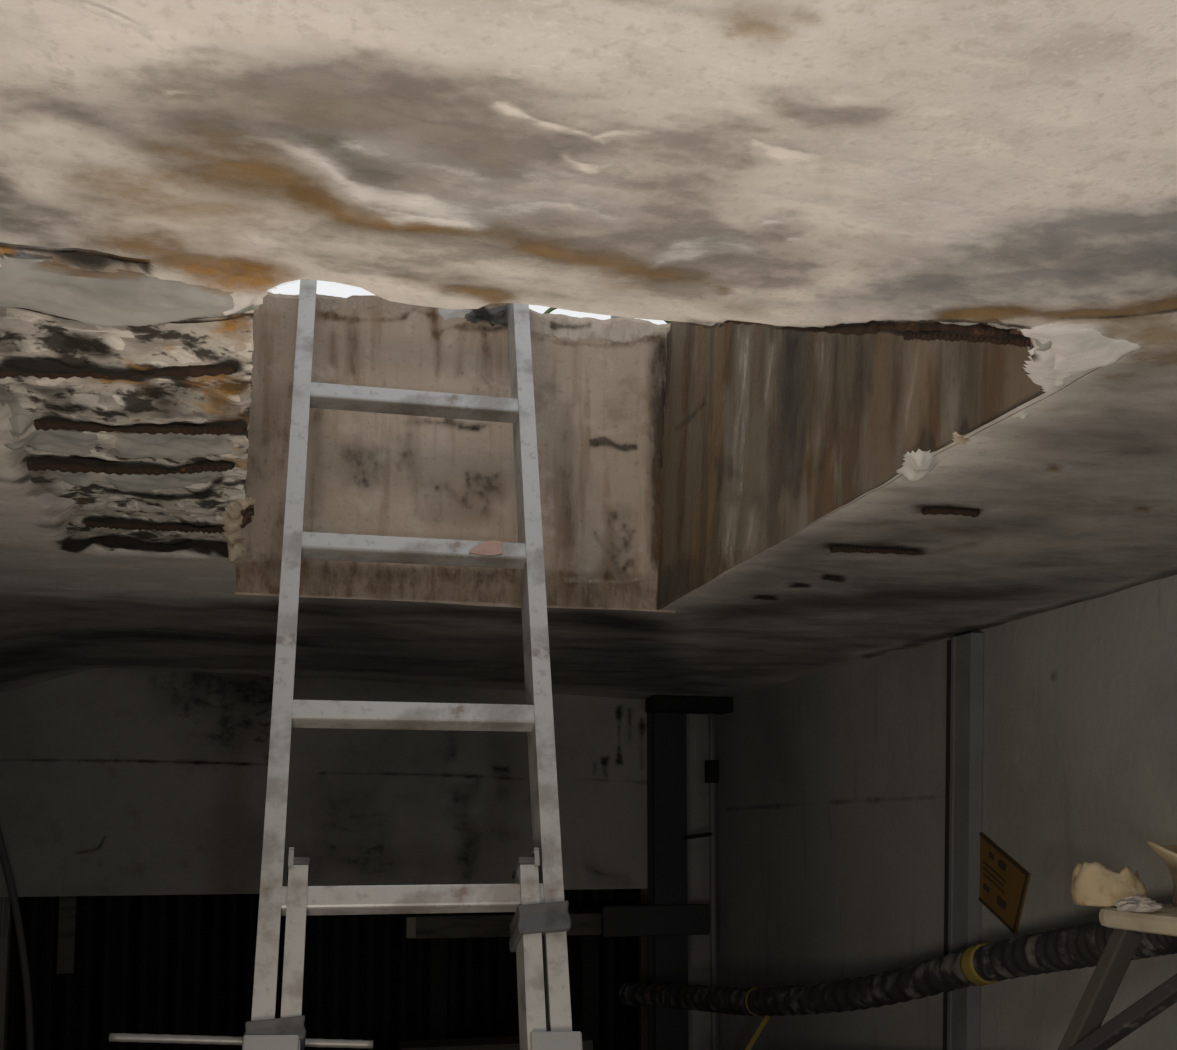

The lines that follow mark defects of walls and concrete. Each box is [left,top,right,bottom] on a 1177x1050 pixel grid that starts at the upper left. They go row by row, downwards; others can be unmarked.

damp [145,65,815,298]
damp [0,207,68,250]
spalling [0,242,151,278]
flaking render [693,319,1148,392]
damp [876,275,976,316]
rust [939,297,1177,365]
damp [971,213,1177,300]
spalling [0,306,256,565]
damp [644,338,701,608]